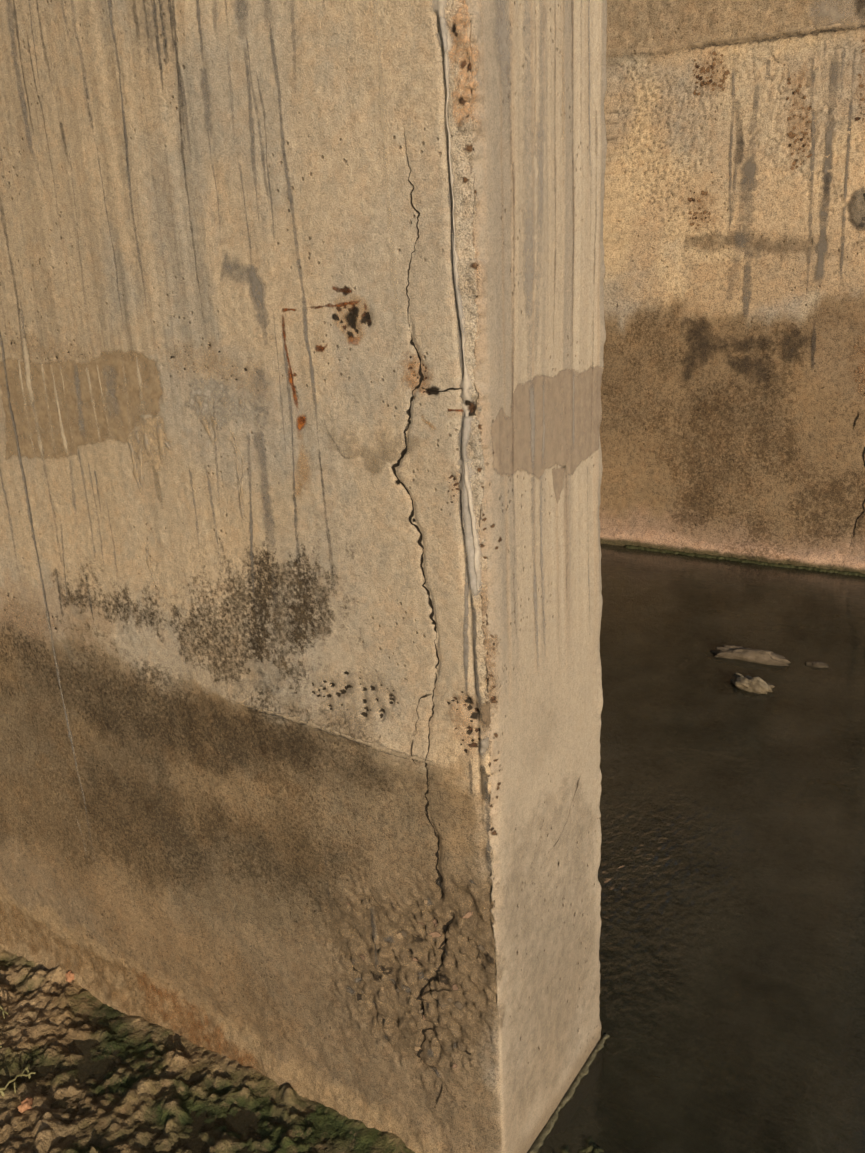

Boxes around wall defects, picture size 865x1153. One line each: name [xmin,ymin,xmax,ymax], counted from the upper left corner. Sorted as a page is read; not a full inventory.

water stain [136,0,189,186]
water stain [270,34,316,402]
water stain [729,124,757,206]
water stain [807,103,865,281]
water stain [0,301,368,779]
rust [282,308,306,430]
rust [312,286,372,341]
crack [262,148,462,1059]
water stain [491,349,603,644]
water stain [684,318,816,382]
crack [851,499,865,542]
crack [854,412,865,466]